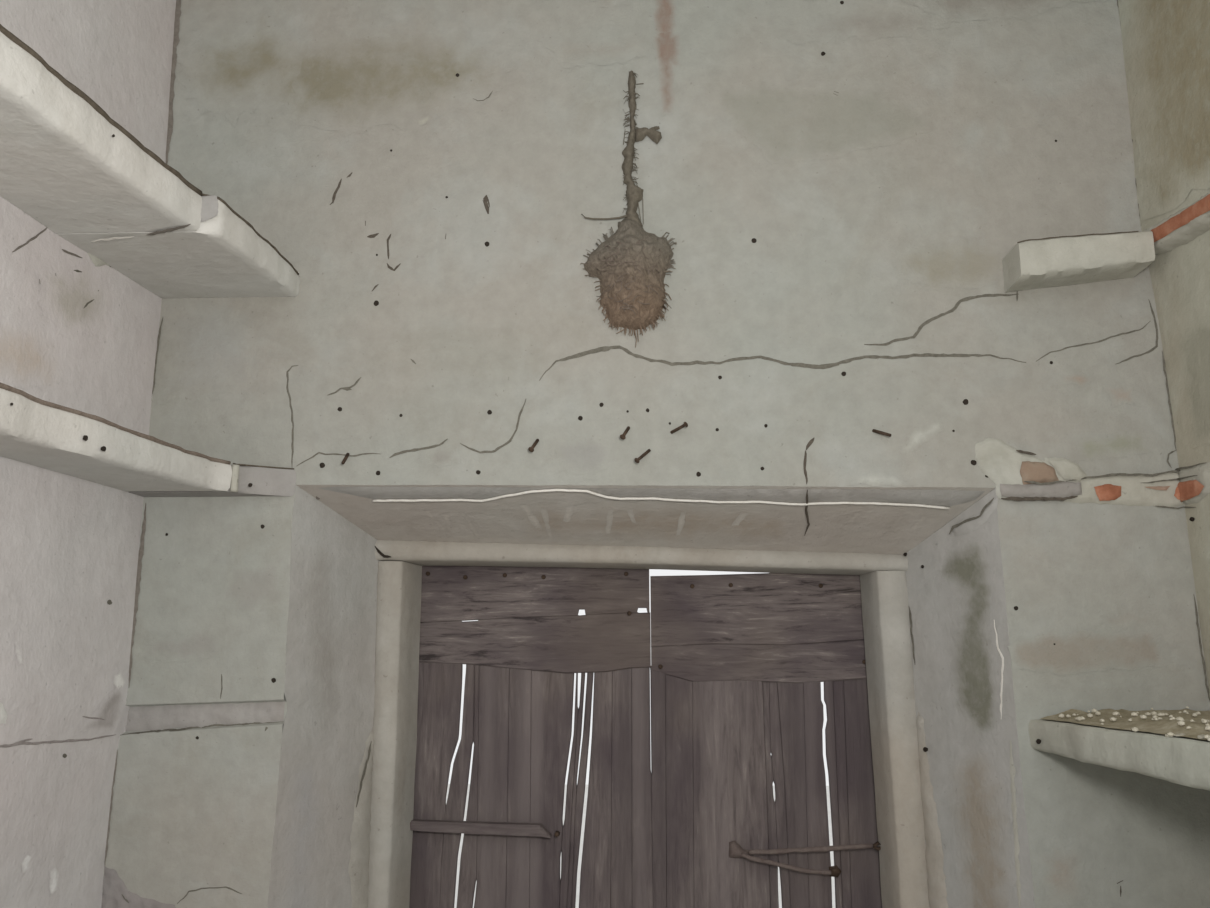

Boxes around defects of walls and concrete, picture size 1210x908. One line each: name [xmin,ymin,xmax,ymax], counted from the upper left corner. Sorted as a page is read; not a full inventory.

corrosion [652,0,683,117]
spalling [1144,193,1210,255]
crack [286,294,1176,467]
spalling [319,438,1210,536]
crack [803,438,814,536]
damp [1008,607,1166,676]
crack [0,674,277,861]
damp [938,538,1019,908]
spalling [101,866,242,908]